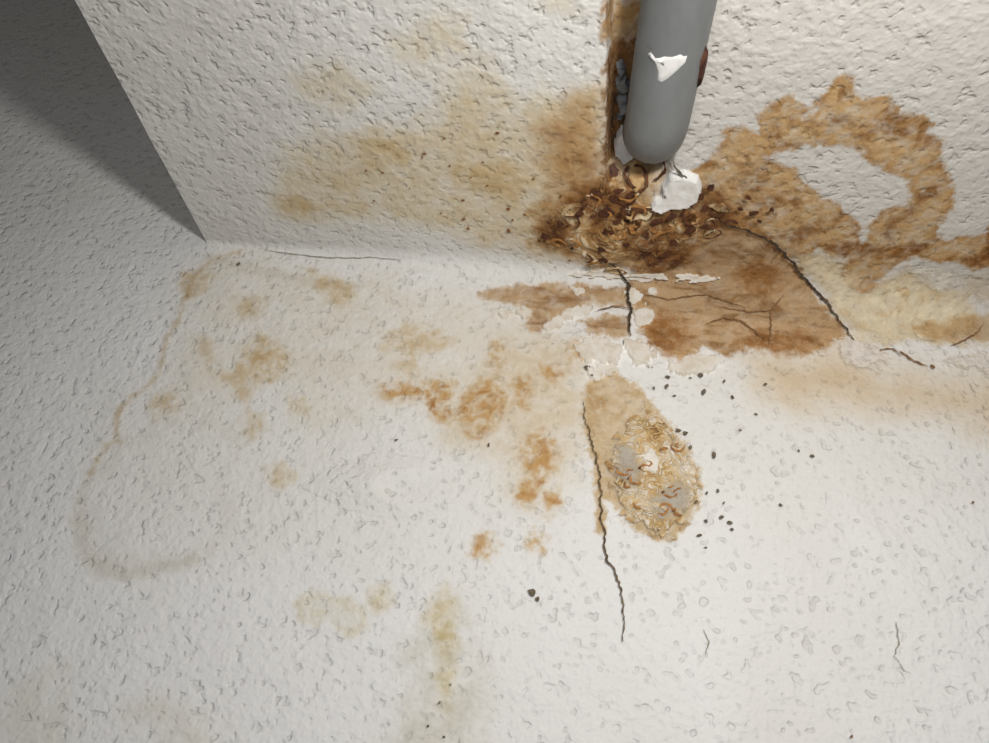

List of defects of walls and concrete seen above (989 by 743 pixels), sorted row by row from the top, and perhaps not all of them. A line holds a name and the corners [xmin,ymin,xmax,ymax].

rust [534,39,774,275]
crack [599,263,784,344]
crack [707,207,855,340]
leakage [800,243,974,344]
crack [881,348,927,366]
crack [953,324,984,345]
crack [583,402,625,641]